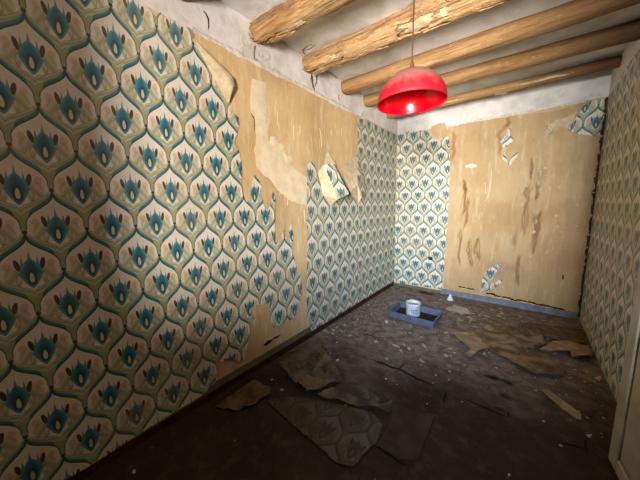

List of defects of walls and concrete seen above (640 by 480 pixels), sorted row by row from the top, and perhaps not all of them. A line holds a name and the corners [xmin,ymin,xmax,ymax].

peeling [193,0,368,380]
peeling [431,100,601,313]